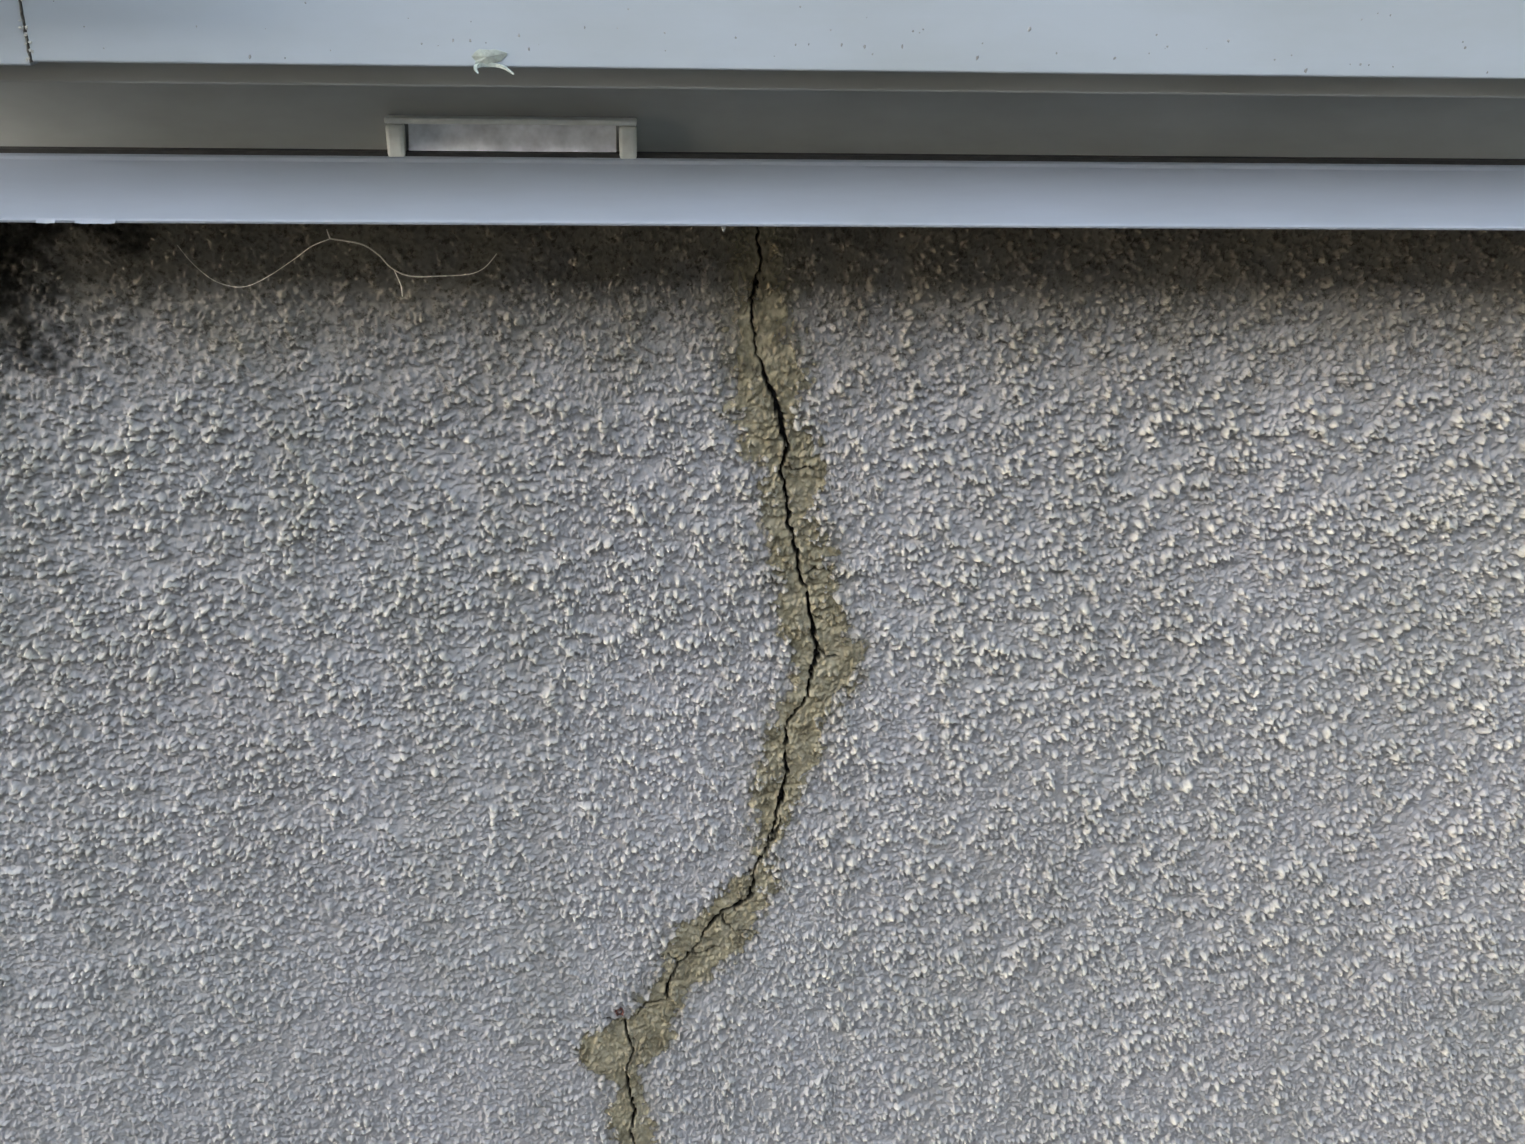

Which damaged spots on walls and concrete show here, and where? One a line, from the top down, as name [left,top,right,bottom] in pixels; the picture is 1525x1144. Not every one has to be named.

crack [607,227,836,1144]